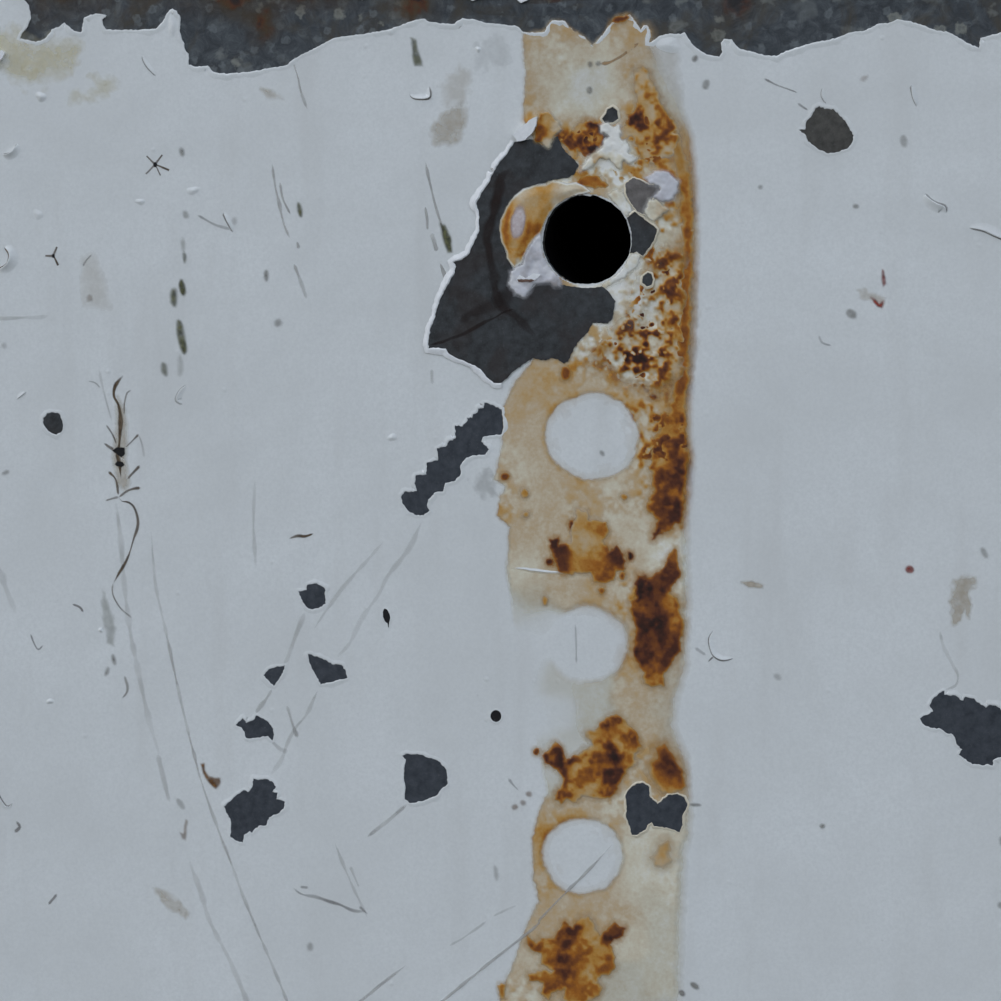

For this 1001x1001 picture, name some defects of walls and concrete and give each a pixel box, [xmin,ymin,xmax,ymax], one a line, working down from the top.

peeling [16,0,1001,81]
peeling [797,102,858,157]
peeling [423,104,678,389]
crack [105,379,140,605]
peeling [397,400,508,518]
corrosion [494,15,695,1001]
peeling [303,651,350,688]
peeling [233,713,277,744]
peeling [916,688,1001,770]
peeling [219,774,290,846]
peeling [398,750,451,807]
peeling [623,781,690,838]